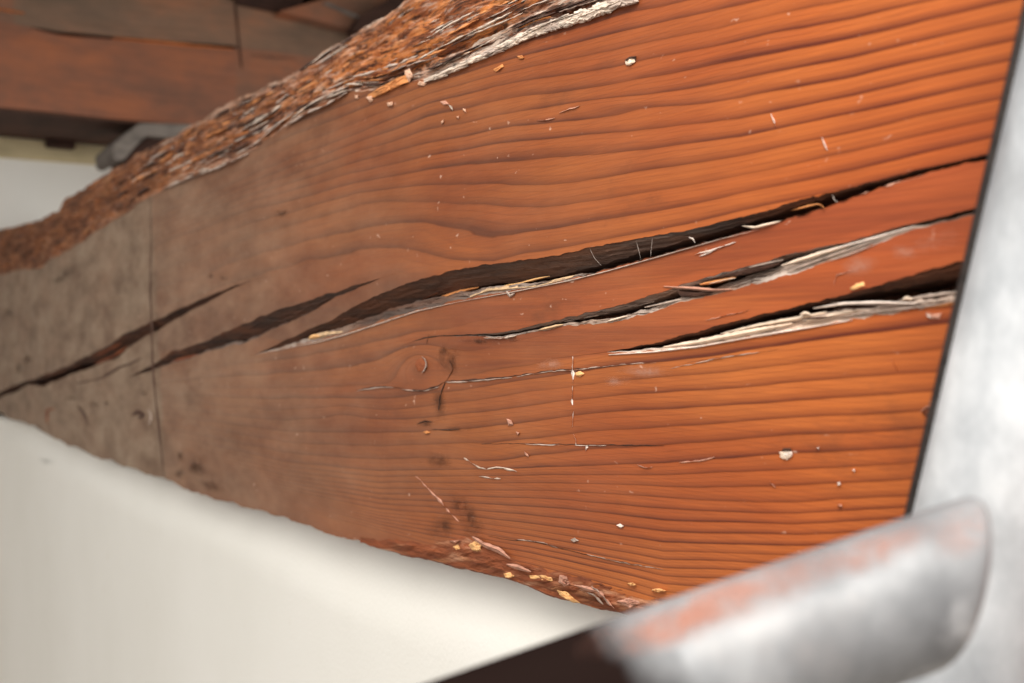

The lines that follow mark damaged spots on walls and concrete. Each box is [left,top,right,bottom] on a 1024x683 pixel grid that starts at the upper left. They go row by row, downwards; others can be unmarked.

crack [0,154,988,398]
crack [358,261,963,431]